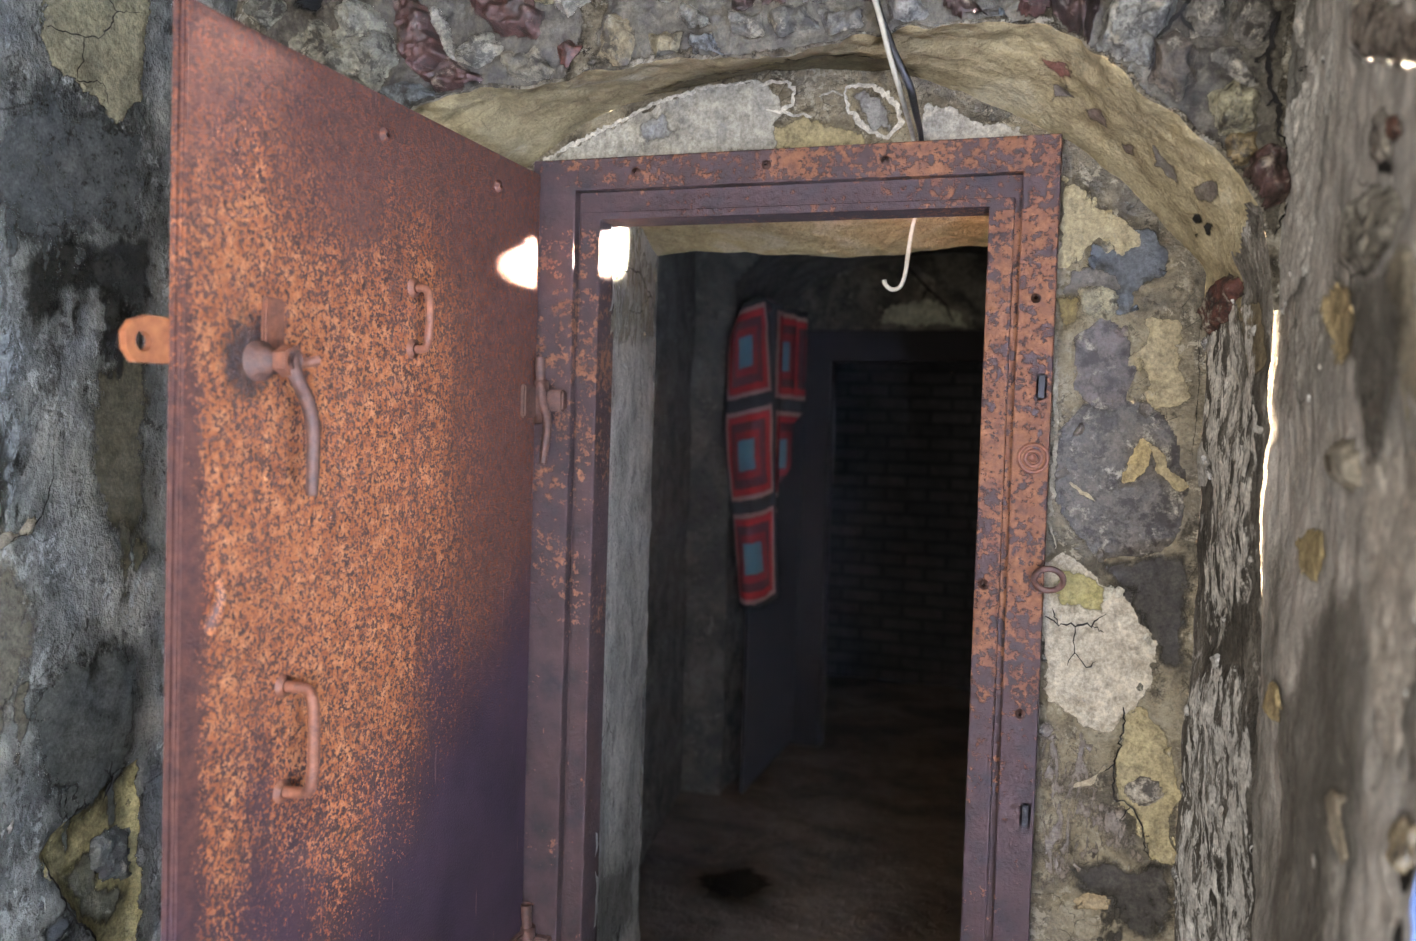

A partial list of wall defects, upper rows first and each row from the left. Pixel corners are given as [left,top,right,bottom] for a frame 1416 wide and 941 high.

spalling [243,0,1355,941]